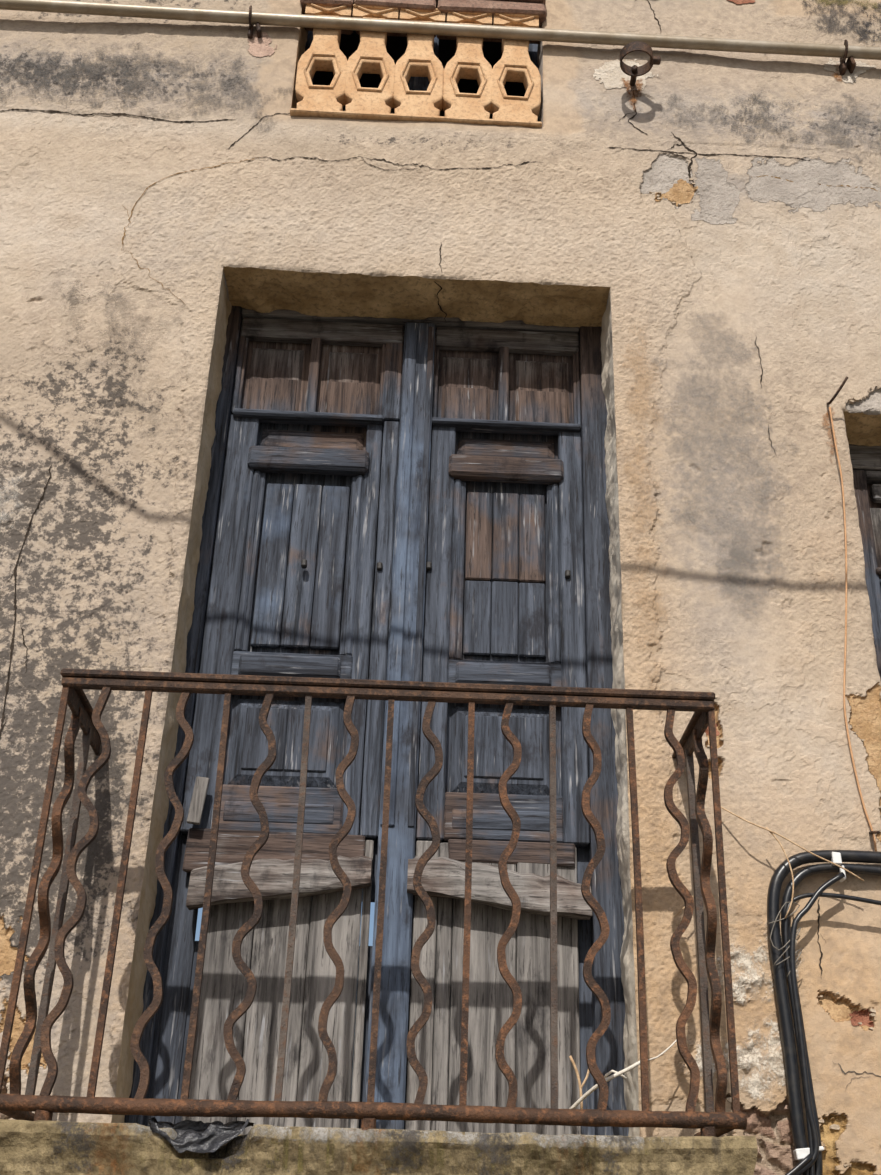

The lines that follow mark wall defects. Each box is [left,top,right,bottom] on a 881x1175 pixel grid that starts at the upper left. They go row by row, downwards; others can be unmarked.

damp [802,0,881,42]
crack [1,109,543,303]
flaking render [640,153,881,224]
crack [435,243,447,323]
flaking render [845,683,881,814]
flaking render [0,915,29,981]
crack [817,897,826,975]
flaking render [0,998,47,1094]
flaking render [695,1019,799,1175]
flaking render [817,992,876,1031]
crack [835,1063,881,1091]
flaking render [819,1114,876,1175]